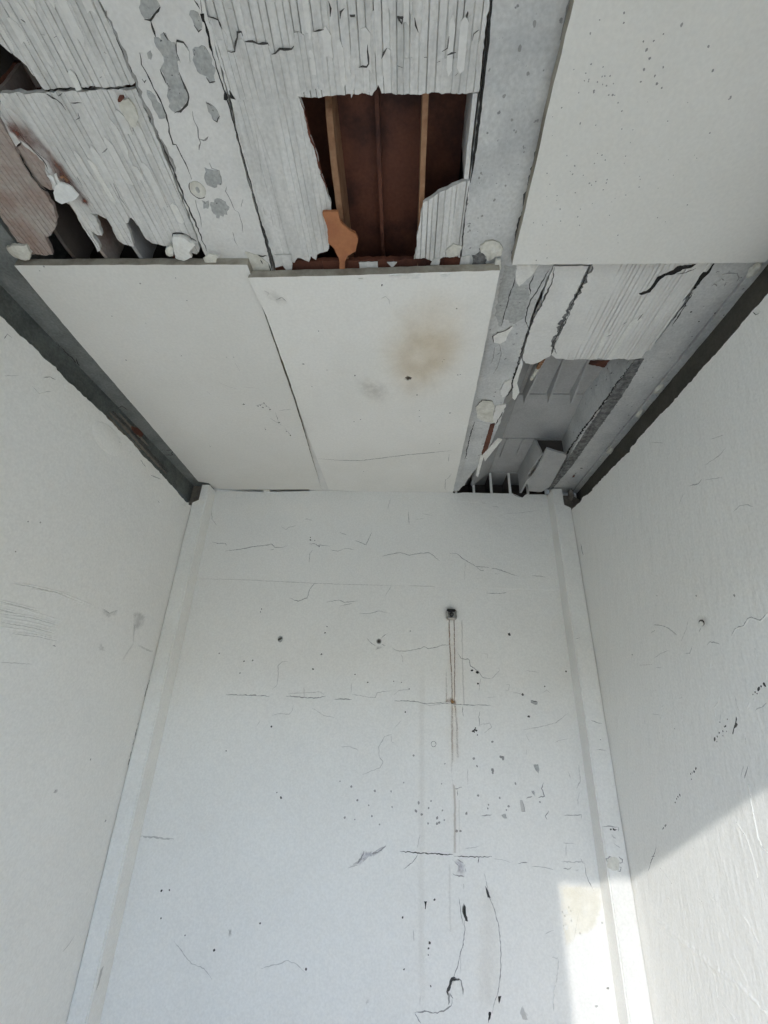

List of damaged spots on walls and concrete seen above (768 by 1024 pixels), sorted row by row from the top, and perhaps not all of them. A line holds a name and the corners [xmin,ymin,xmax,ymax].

flaking render [139,0,480,122]
flaking render [65,110,184,224]
peeling [202,168,229,218]
flaking render [245,252,293,271]
peeling [322,210,421,286]
peeling [430,240,530,327]
peeling [589,360,610,368]
flaking render [458,358,523,486]
crack [211,512,543,614]
crack [226,645,551,775]
crack [402,837,593,1012]
crack [415,1004,452,1023]